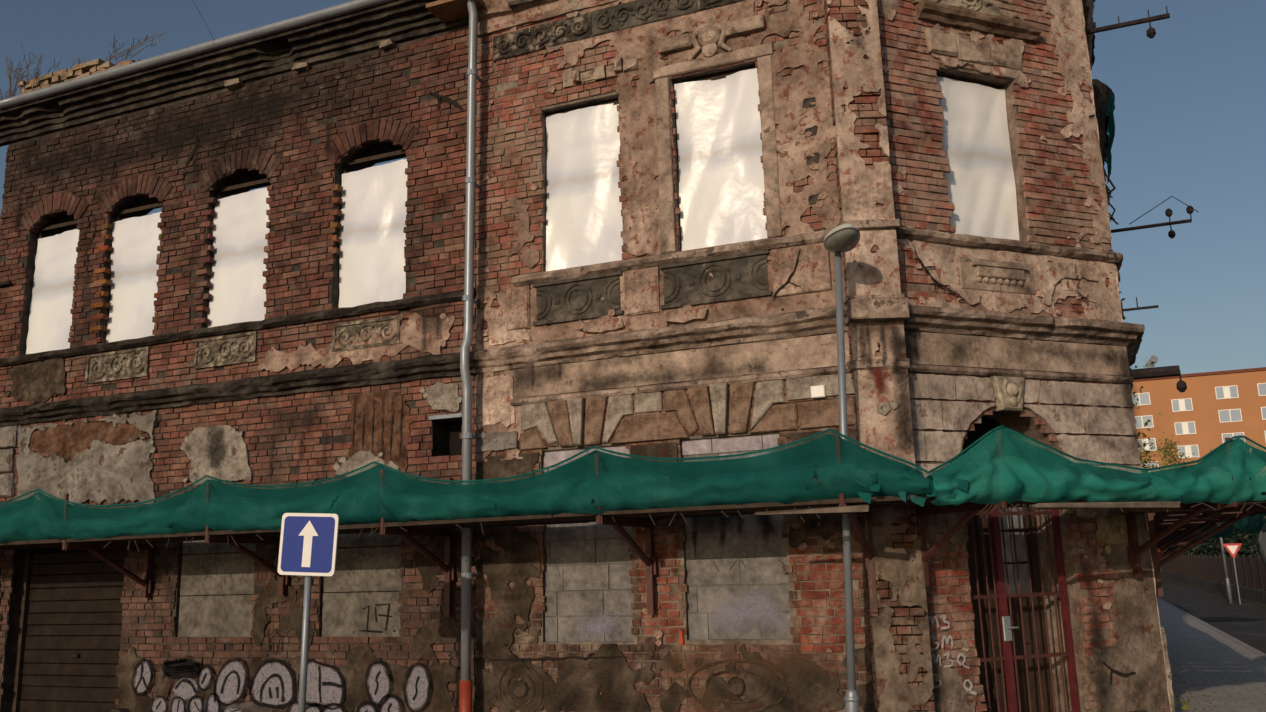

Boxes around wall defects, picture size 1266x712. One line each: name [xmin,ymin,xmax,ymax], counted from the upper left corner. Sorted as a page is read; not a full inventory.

spalling [797,97,818,138]
spalling [806,153,820,170]
spalling [808,190,827,208]
crack [913,246,964,299]
peeling [258,312,455,372]
peeling [419,374,519,453]
peeling [16,410,159,505]
peeling [180,425,255,485]
peeling [1076,509,1128,554]
spalling [1072,555,1115,657]
crack [1102,661,1136,684]